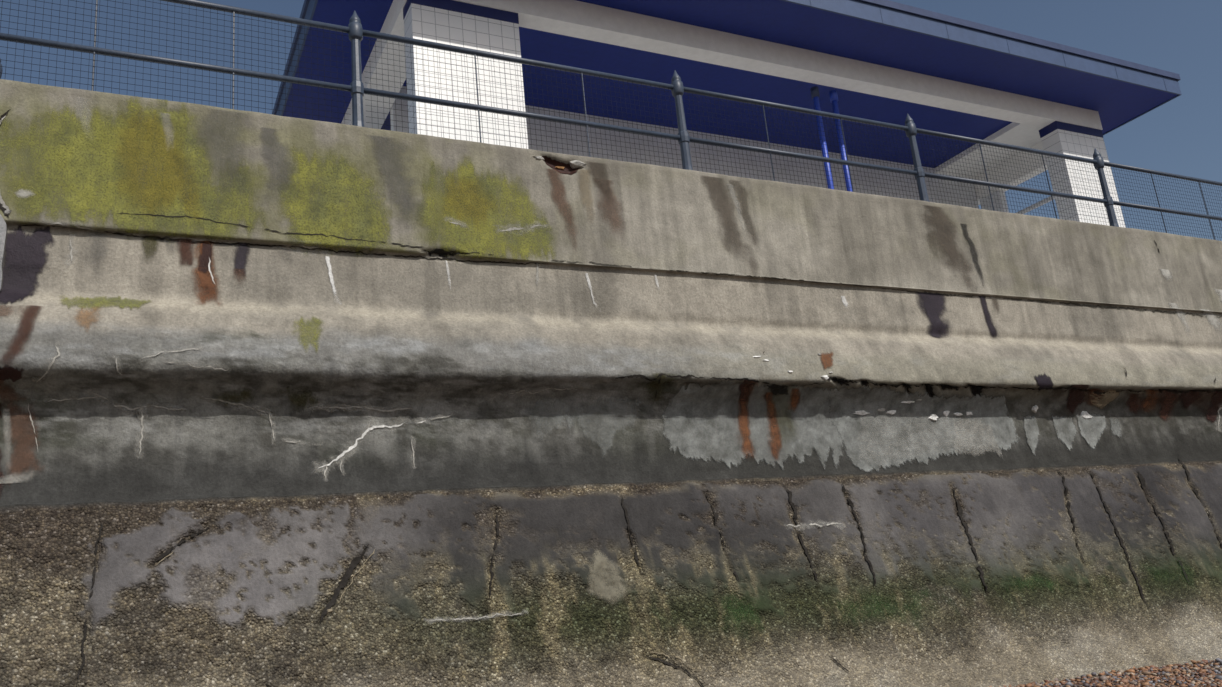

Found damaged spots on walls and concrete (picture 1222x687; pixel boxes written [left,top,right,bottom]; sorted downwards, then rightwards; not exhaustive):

spalling [532,156,587,174]
leakage [0,226,53,304]
corrosion [180,238,217,303]
leakage [925,205,982,277]
leakage [917,292,949,338]
leakage [980,296,998,337]
corrosion [0,305,39,478]
crack [37,347,452,478]
corrosion [738,379,800,459]
peeling [662,368,1222,472]
corrosion [1128,389,1222,422]
spalling [154,526,209,565]